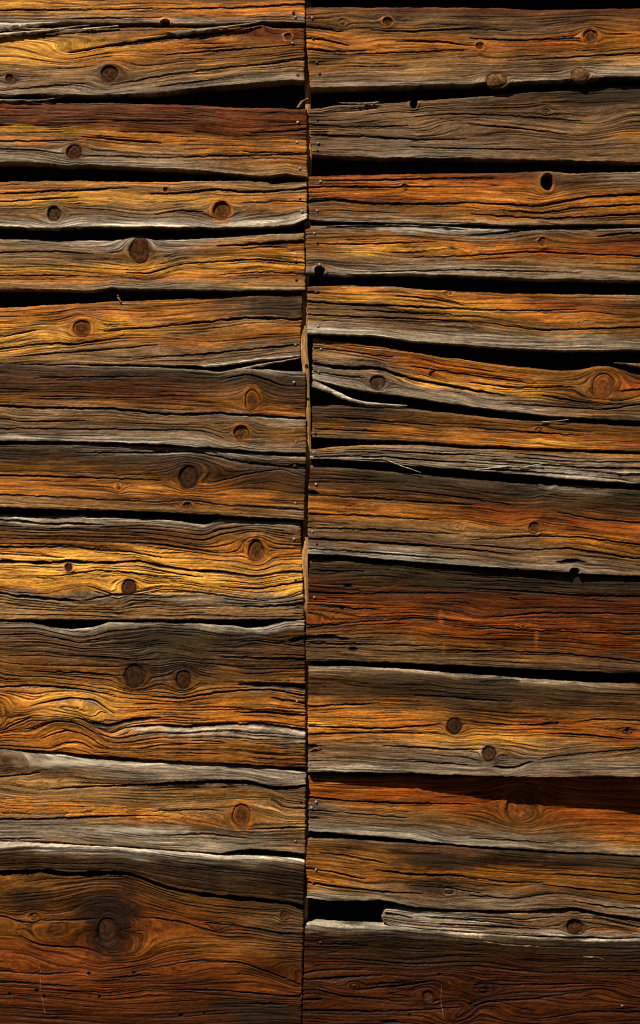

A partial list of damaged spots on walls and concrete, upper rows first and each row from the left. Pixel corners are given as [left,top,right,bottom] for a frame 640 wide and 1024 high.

crack [0,178,640,410]
crack [0,853,640,929]
crack [0,915,640,1023]